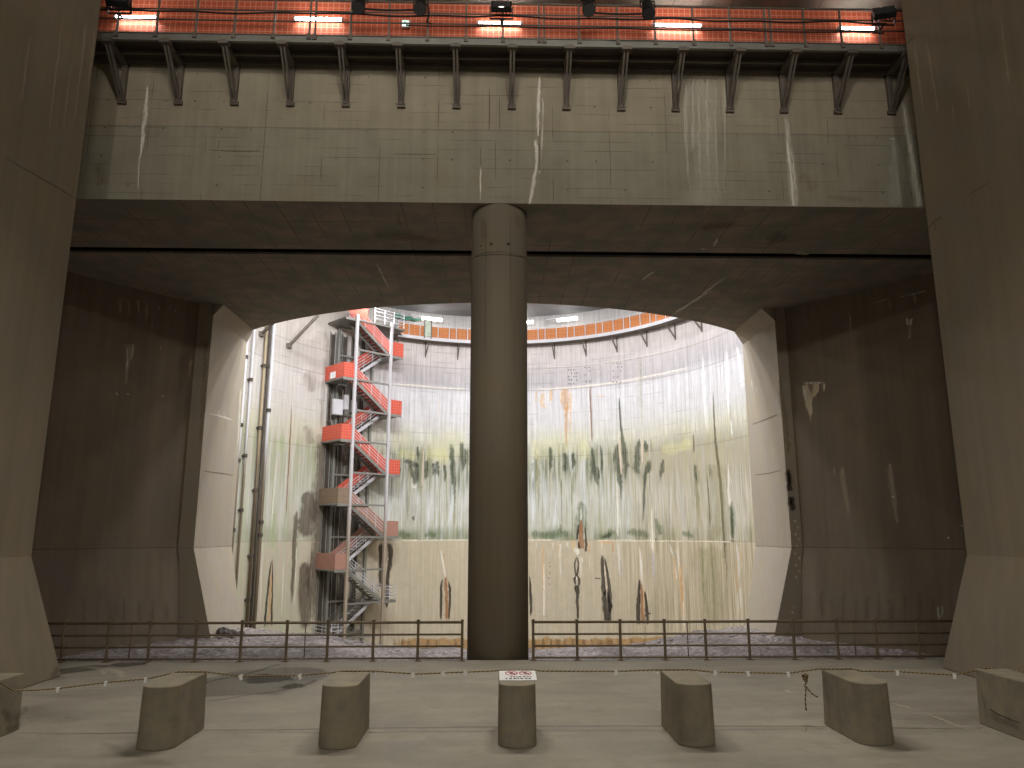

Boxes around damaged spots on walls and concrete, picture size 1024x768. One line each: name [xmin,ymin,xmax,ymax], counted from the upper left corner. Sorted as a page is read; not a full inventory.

water stain [261,441,346,627]
water stain [379,544,393,607]
water stain [560,502,587,618]
water stain [595,530,651,624]